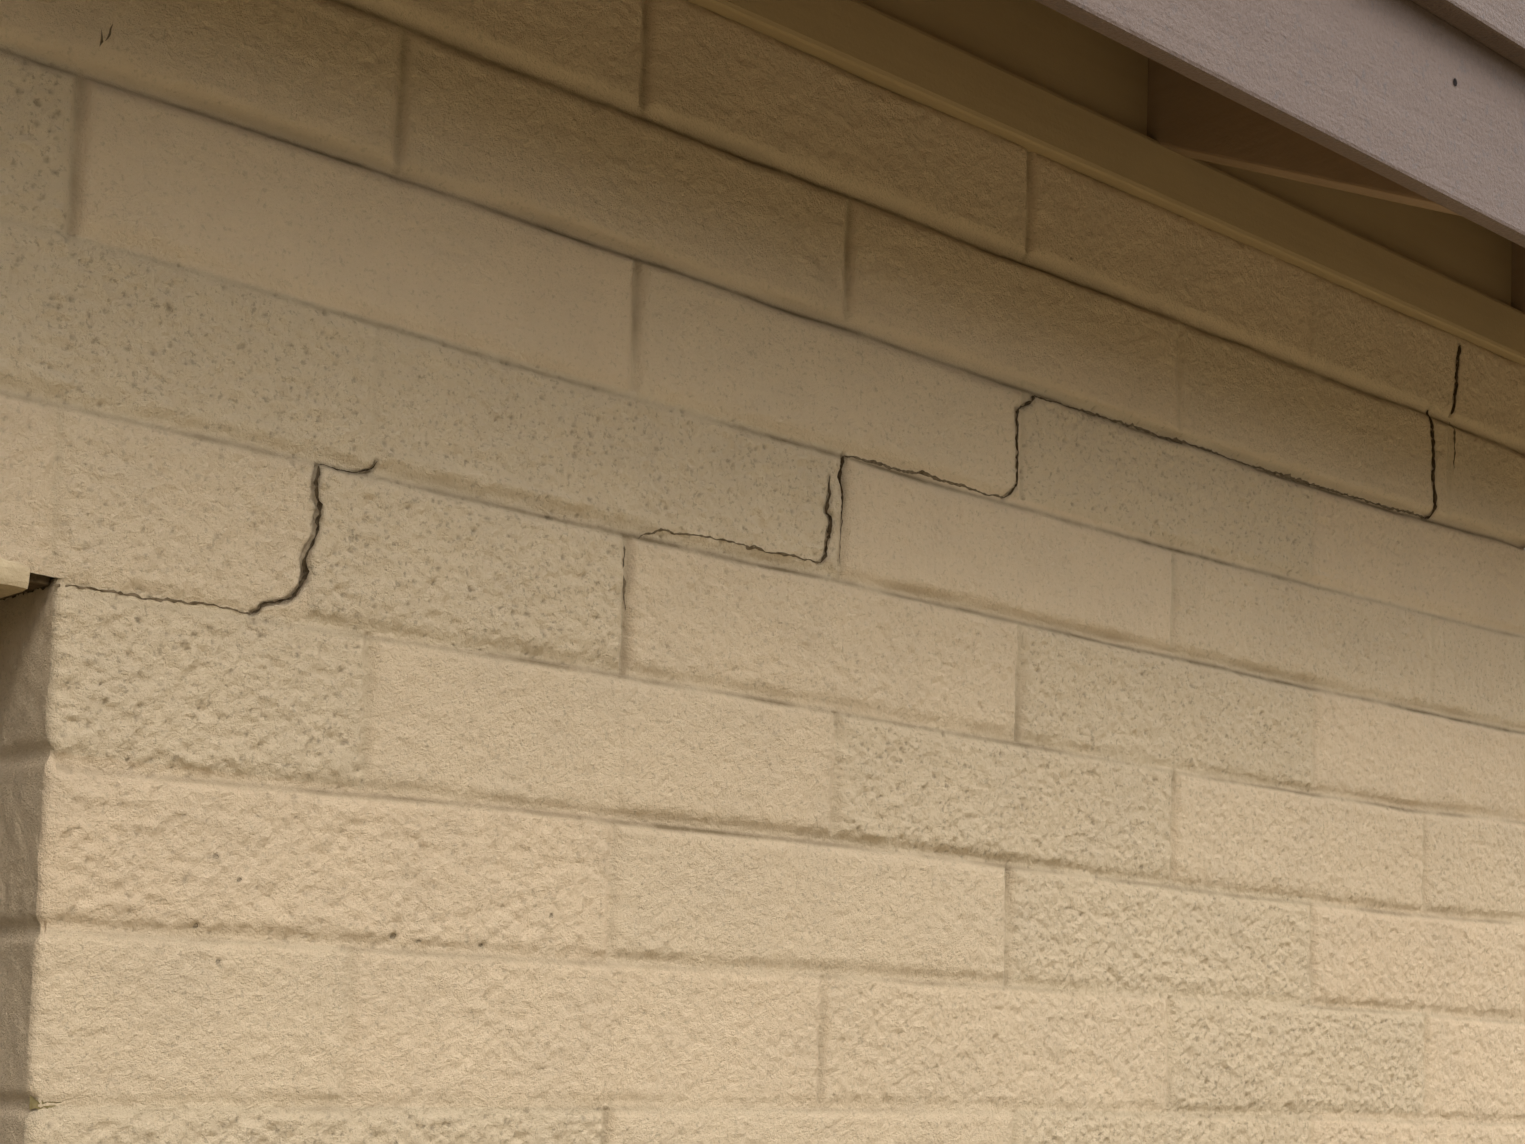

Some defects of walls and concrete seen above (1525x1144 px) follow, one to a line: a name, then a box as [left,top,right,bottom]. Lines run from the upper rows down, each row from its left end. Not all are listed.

crack [2,462,377,615]
crack [623,345,1461,610]